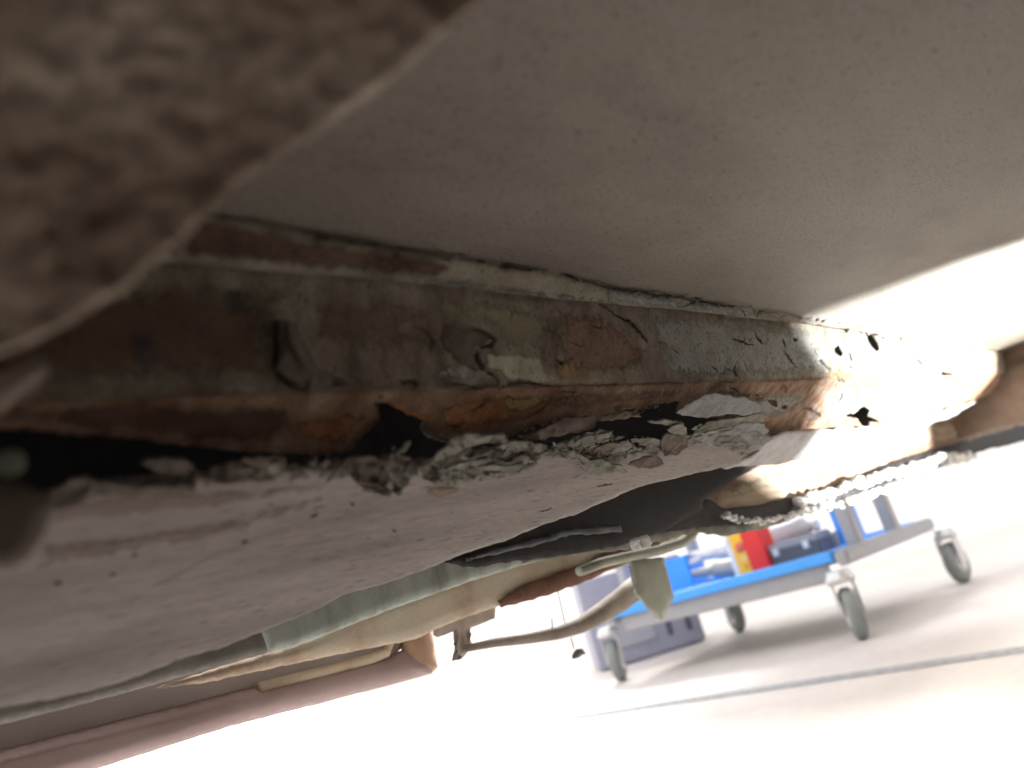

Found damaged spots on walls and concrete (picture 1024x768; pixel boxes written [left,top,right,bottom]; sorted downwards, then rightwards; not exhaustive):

hole [802,323,901,351]
peeling [485,353,549,383]
hole [846,406,877,426]
spalling [0,392,773,511]